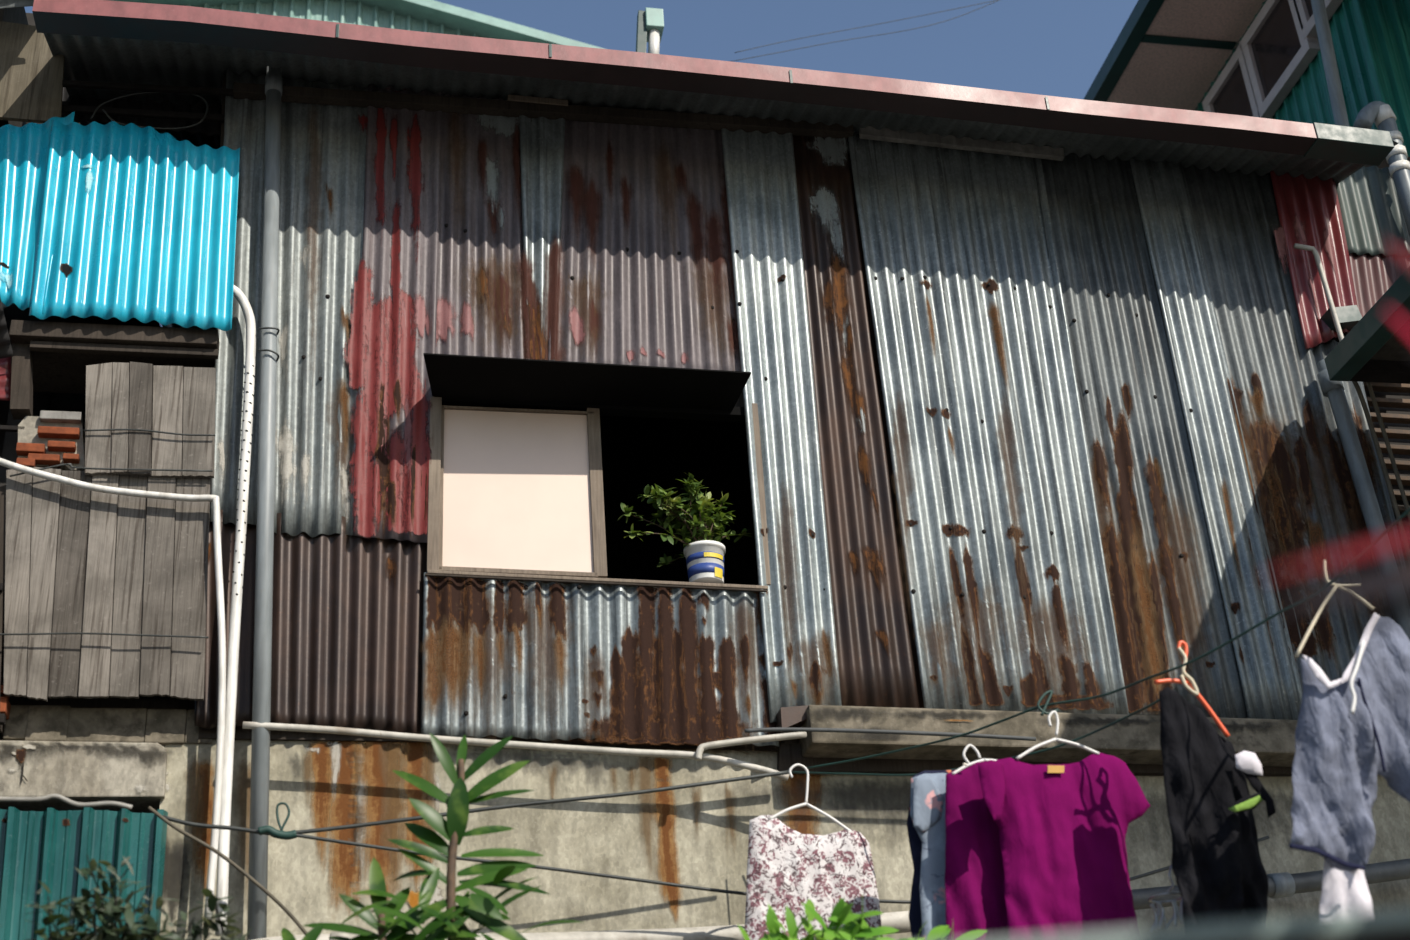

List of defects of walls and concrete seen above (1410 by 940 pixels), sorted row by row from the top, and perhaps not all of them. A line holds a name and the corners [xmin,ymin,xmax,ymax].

peeling [343,108,474,538]
rust [475,238,566,361]
rust [675,164,739,357]
rust [823,253,869,429]
rust [857,446,879,512]
rust [942,383,1189,722]
rust [1222,373,1377,666]
rust [305,741,434,908]
rust [424,576,567,710]
rust [582,586,793,919]
rust [781,774,821,835]
rust [792,630,832,705]